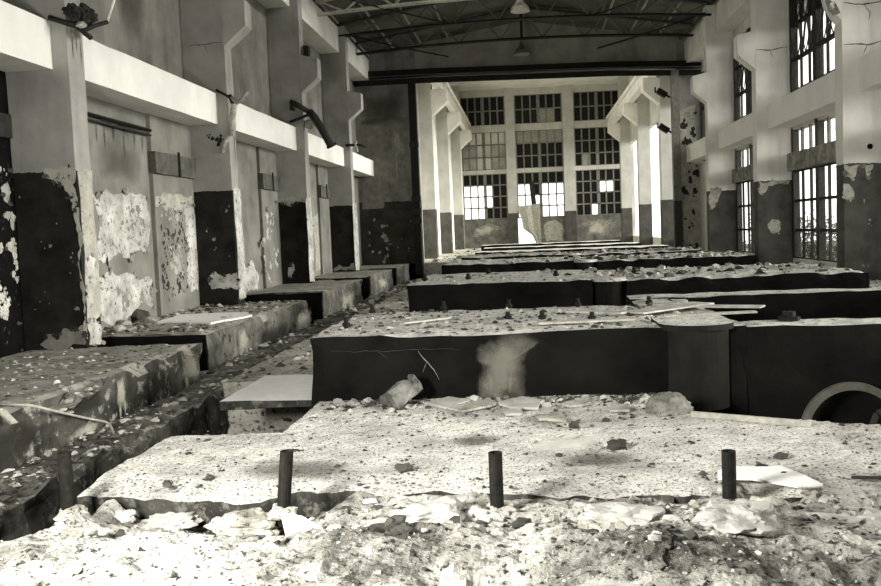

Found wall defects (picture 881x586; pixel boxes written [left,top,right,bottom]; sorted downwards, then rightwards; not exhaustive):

peeling [0,166,20,283]
peeling [0,285,23,325]